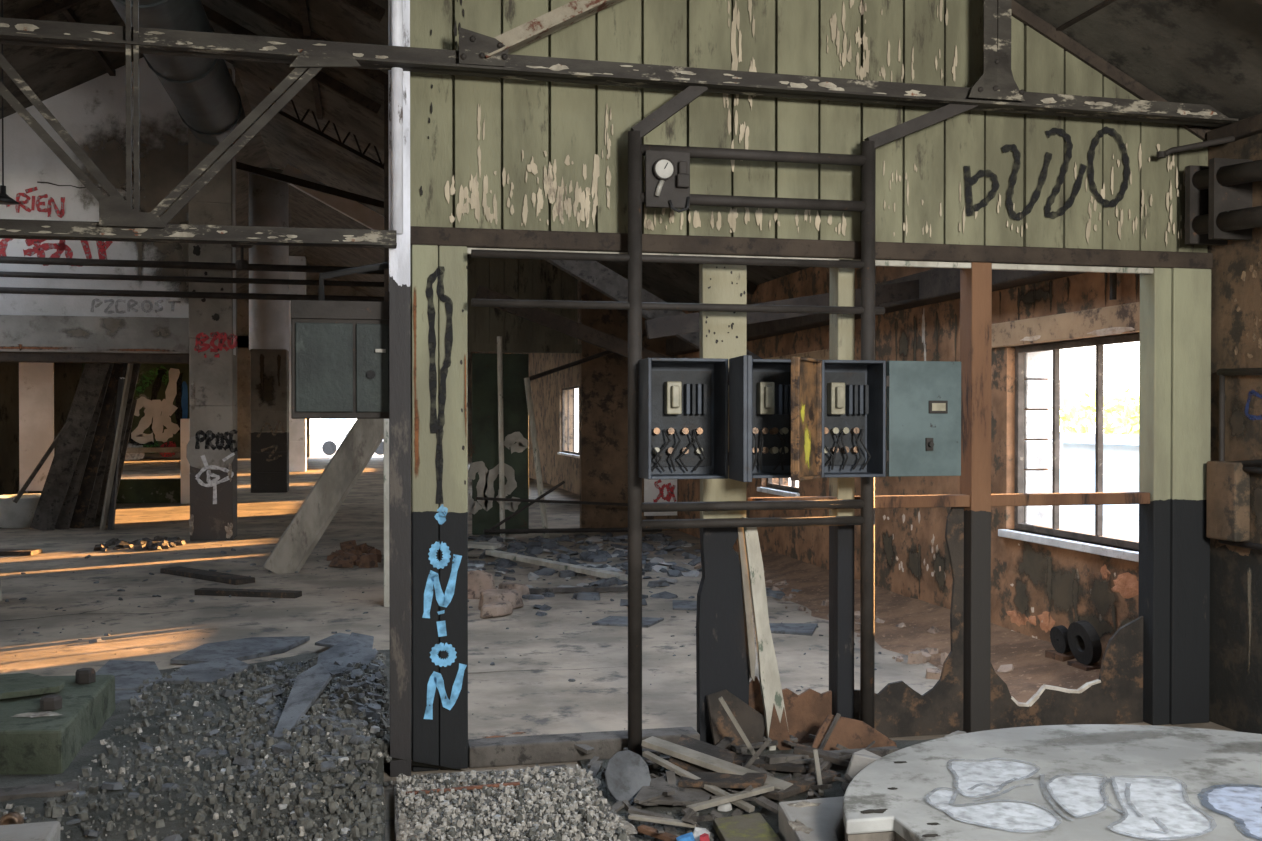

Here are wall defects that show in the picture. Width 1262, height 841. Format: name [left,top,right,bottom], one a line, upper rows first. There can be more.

peeling [723,0,757,172]
peeling [780,0,926,96]
peeling [937,0,948,26]
peeling [935,46,957,81]
peeling [444,104,613,228]
damp [882,531,946,597]
damp [1013,541,1138,640]